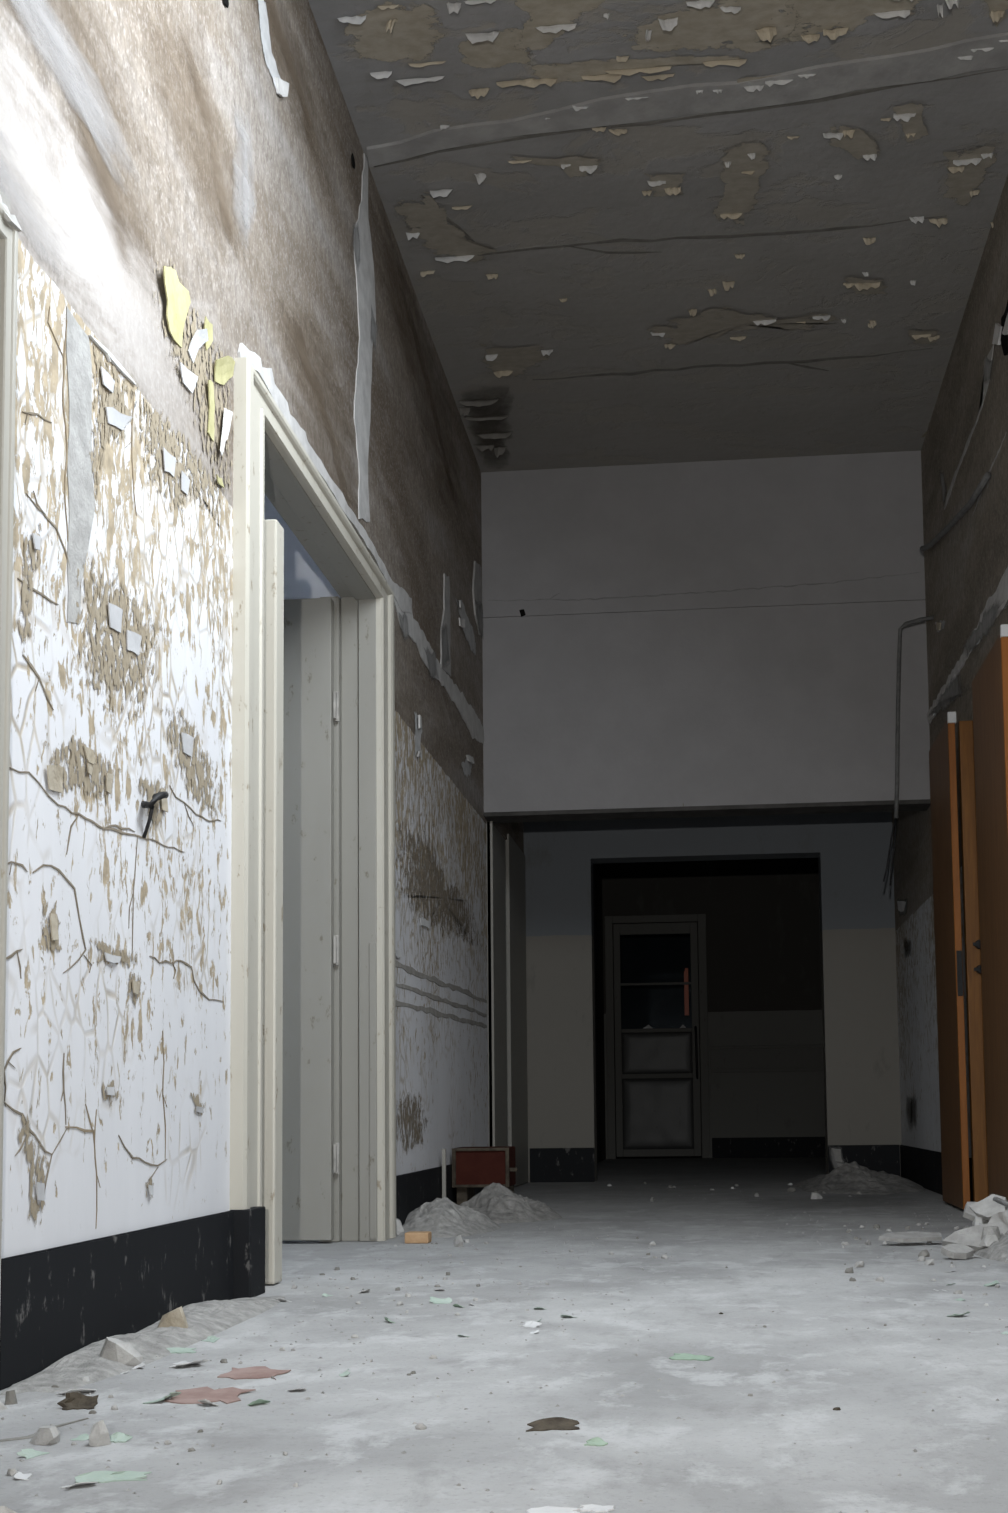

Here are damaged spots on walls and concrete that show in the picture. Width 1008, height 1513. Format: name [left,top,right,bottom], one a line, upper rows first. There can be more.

spalling [258,0,289,97]
peeling [337,0,959,101]
crack [374,69,1008,167]
crack [421,195,947,256]
peeling [89,258,235,527]
peeling [17,523,41,656]
peeling [76,555,223,816]
peeling [42,735,121,803]
peeling [42,900,62,953]
crack [6,767,224,1002]
peeling [90,938,142,1008]
crack [4,1031,167,1227]